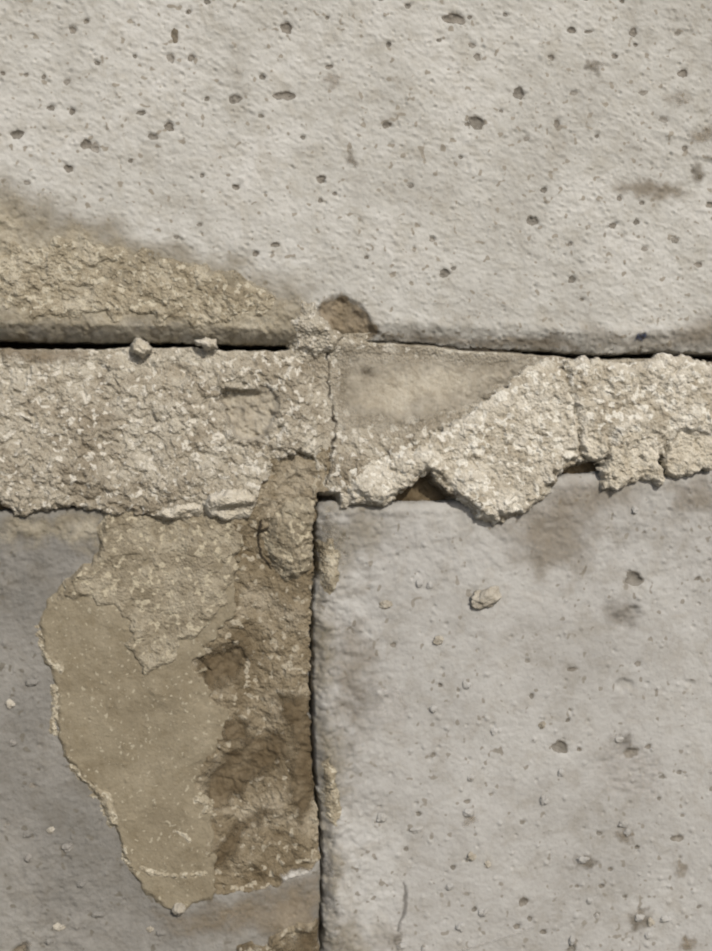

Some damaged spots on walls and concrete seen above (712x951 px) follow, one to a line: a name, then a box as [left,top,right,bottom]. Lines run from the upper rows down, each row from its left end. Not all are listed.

crack [0,343,184,351]
crack [216,345,284,353]
crack [378,340,521,353]
crack [565,354,652,362]
crack [692,355,712,363]
crack [326,352,336,442]
crack [257,519,272,570]
spalling [184,447,331,895]